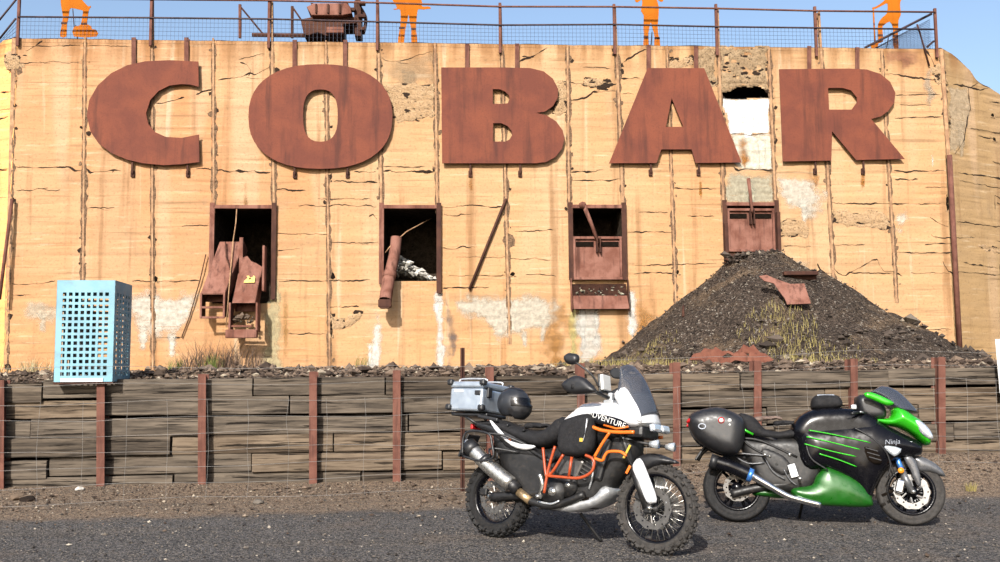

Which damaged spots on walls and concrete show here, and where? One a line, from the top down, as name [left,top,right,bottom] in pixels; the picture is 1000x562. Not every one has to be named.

crack [0,166,120,198]
crack [20,41,130,64]
spalling [374,45,442,212]
spalling [669,150,681,304]
spalling [666,45,778,202]
spalling [718,163,726,212]
leakage [723,99,819,221]
crack [817,50,1000,276]